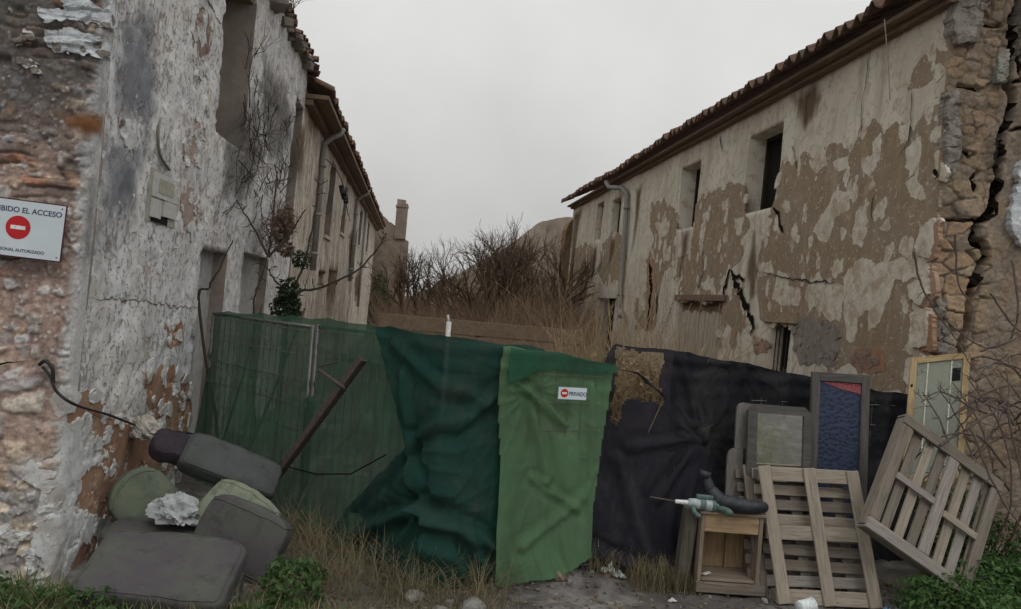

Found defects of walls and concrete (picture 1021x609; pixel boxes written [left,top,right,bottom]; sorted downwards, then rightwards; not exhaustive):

flaking render [12,0,117,75]
water stain [120,17,154,111]
water stain [109,150,138,217]
flaking render [633,0,991,393]
crack [945,0,1021,289]
crack [645,251,835,335]
flaking render [0,319,193,589]